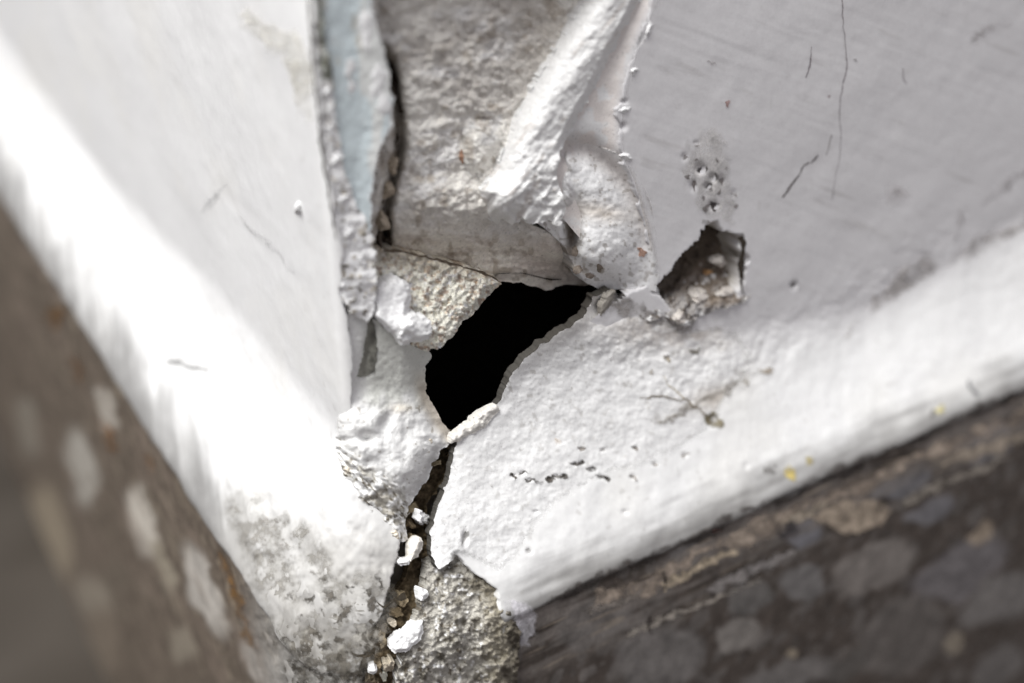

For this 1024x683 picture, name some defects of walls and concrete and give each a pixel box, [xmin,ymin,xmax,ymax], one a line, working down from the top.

crack [375,55,500,282]
spalling [611,133,751,332]
crack [782,1,848,198]
peeling [229,506,309,596]
crack [353,429,453,683]
spalling [270,0,589,683]
spalling [510,447,611,483]
crack [640,348,724,428]
crack [759,367,773,375]